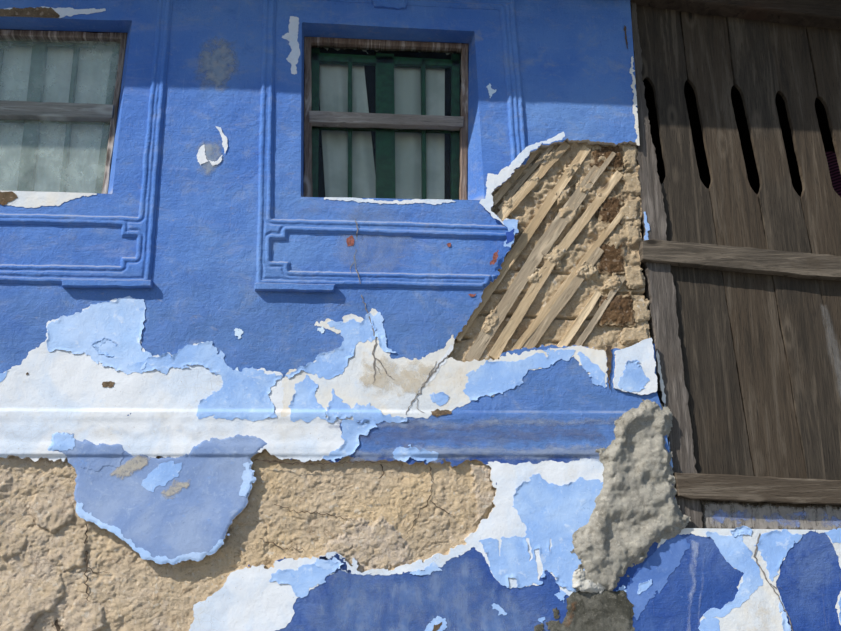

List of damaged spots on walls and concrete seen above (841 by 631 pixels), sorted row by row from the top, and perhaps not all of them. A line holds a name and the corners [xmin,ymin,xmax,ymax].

flaking render [0,6,106,18]
peeling [282,16,300,75]
flaking render [0,25,666,631]
crack [350,219,395,383]
crack [406,355,448,413]
crack [274,504,354,521]
crack [84,524,108,601]
peeling [616,509,841,631]
crack [753,534,793,631]